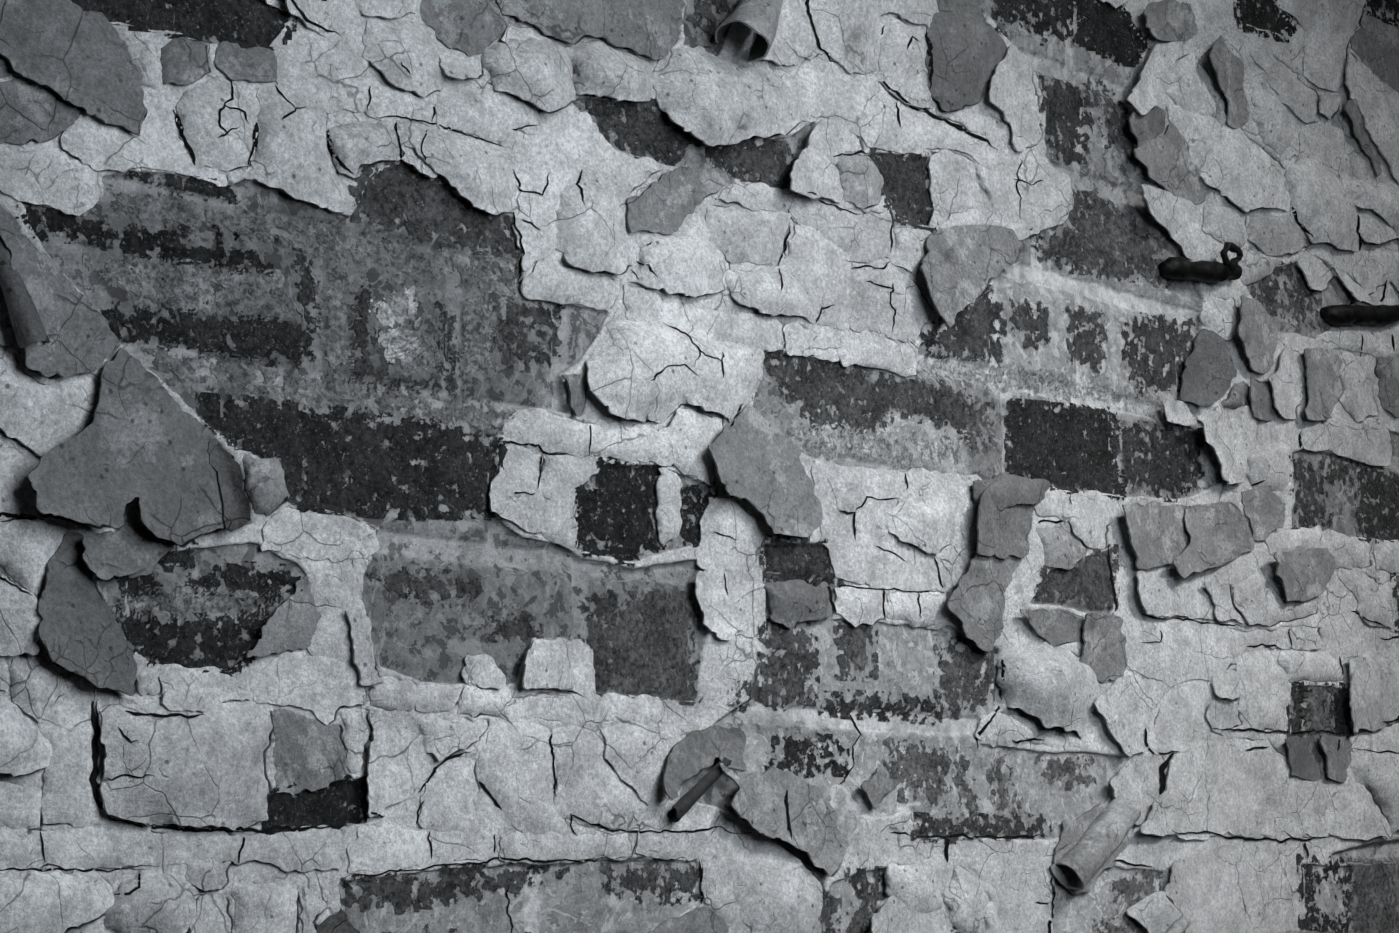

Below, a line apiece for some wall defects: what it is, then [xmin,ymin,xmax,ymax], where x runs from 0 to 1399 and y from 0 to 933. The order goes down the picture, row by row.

crack [805,0,839,64]
crack [880,25,1043,219]
crack [367,86,585,287]
peeling [0,0,1399,454]
crack [778,226,791,291]
crack [852,223,896,330]
crack [652,322,744,427]
crack [501,425,592,495]
crack [827,473,945,619]
crack [0,828,155,895]
crack [89,701,753,933]
crack [890,832,1047,863]